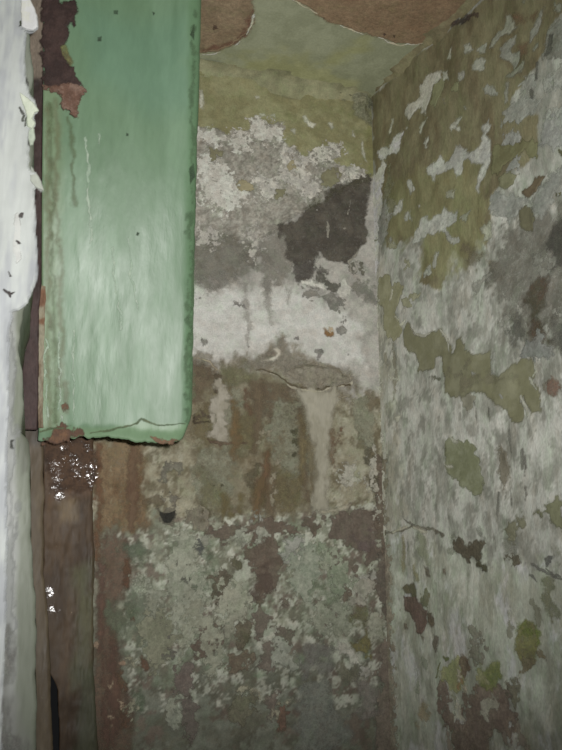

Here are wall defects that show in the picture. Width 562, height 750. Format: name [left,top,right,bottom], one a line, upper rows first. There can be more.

damp [194,174,378,340]
peeling [195,0,562,441]
peeling [0,0,43,750]
crack [259,369,353,398]
corrosion [41,422,84,445]
peeling [444,435,484,496]
peeling [533,495,562,529]
corrosion [93,438,151,750]
peeling [125,411,399,750]
spalling [403,583,434,639]
spalling [435,529,487,572]
spalling [437,677,528,750]